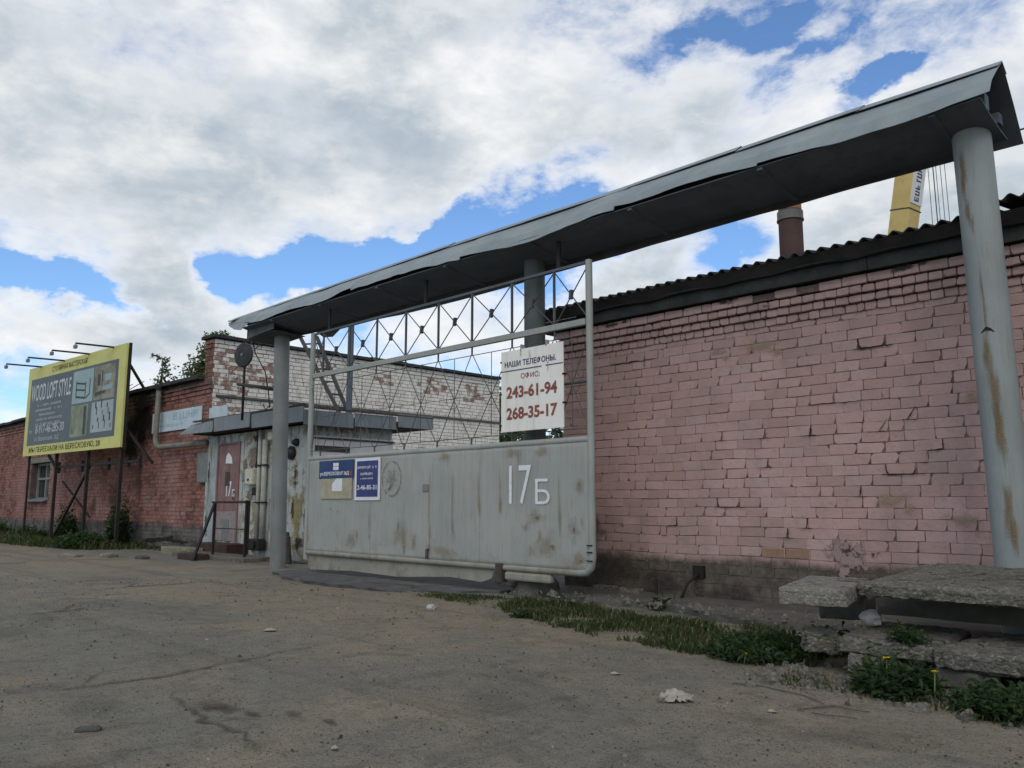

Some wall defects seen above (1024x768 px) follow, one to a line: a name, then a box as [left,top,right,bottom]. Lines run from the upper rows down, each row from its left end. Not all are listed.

peeling [417,377,447,395]
peeling [463,383,483,402]
rust [984,342,1005,453]
spalling [822,538,880,577]